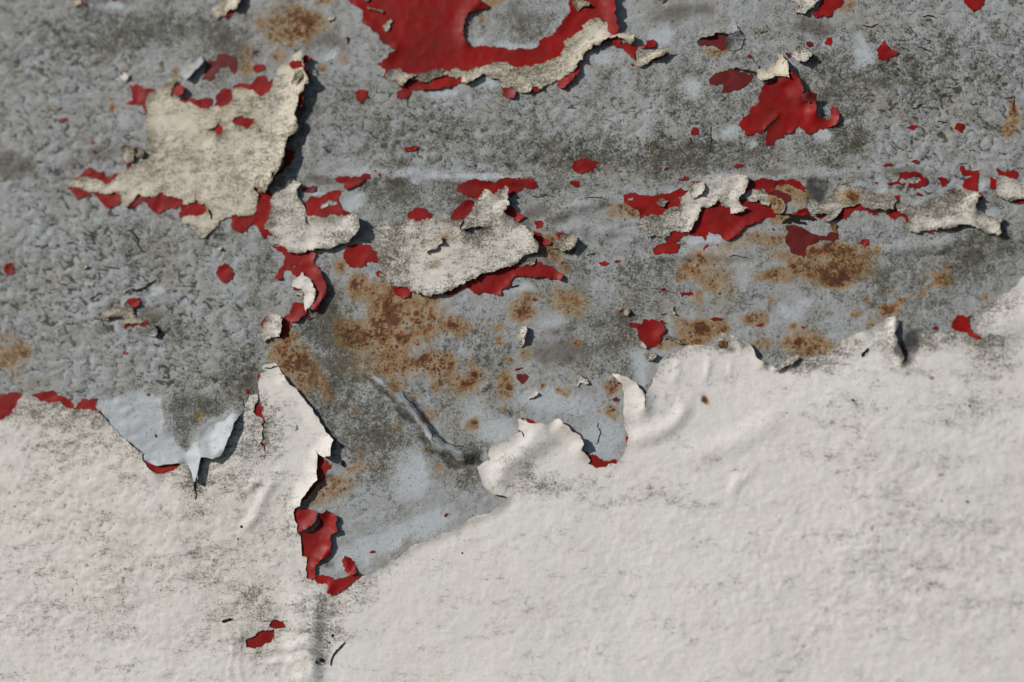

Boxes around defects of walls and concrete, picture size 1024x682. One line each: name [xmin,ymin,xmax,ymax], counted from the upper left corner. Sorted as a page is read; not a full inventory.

rust [232,0,352,83]
peeling [68,51,577,342]
rust [257,231,598,476]
peeling [349,0,682,106]
rust [646,177,960,364]
peeling [623,19,1024,258]
peeling [975,277,1024,331]
peeling [0,305,1024,682]